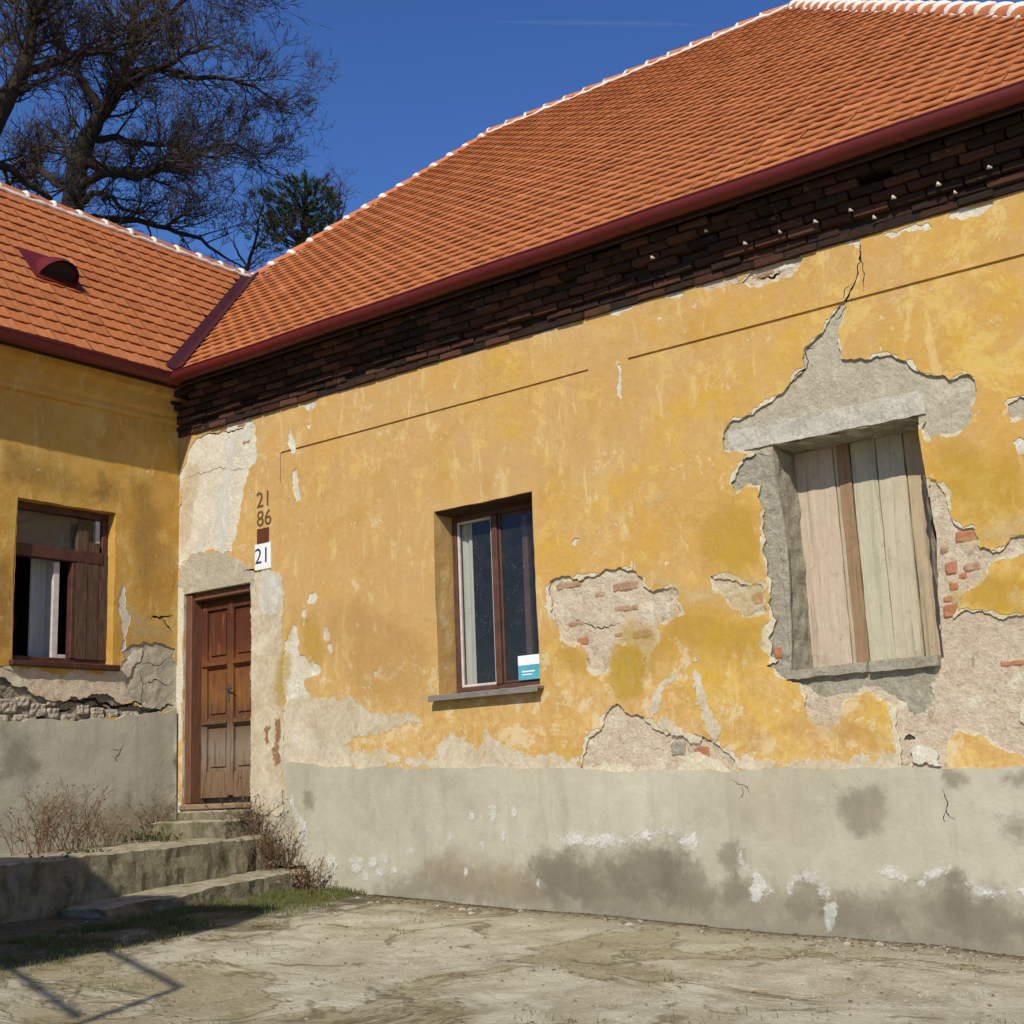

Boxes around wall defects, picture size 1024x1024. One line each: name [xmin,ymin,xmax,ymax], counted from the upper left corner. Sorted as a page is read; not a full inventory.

crack [837,246,865,319]
spalling [178,418,258,568]
spalling [250,253,1024,865]
crack [151,614,173,632]
spalling [0,580,186,748]
crack [36,657,174,719]
leakage [351,855,397,880]
leakage [558,829,698,850]
leakage [739,845,772,902]
leakage [787,871,838,932]
leakage [878,866,951,888]
leakage [965,883,1024,897]